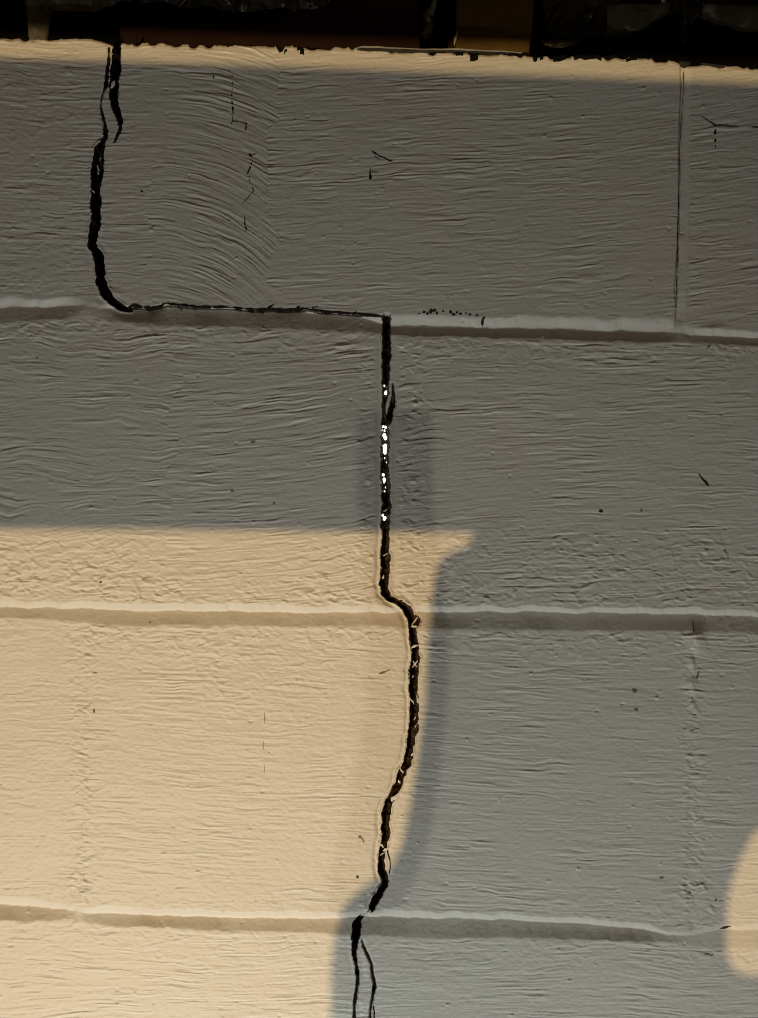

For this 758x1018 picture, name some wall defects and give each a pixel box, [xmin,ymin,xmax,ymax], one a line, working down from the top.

crack [87,34,440,1018]